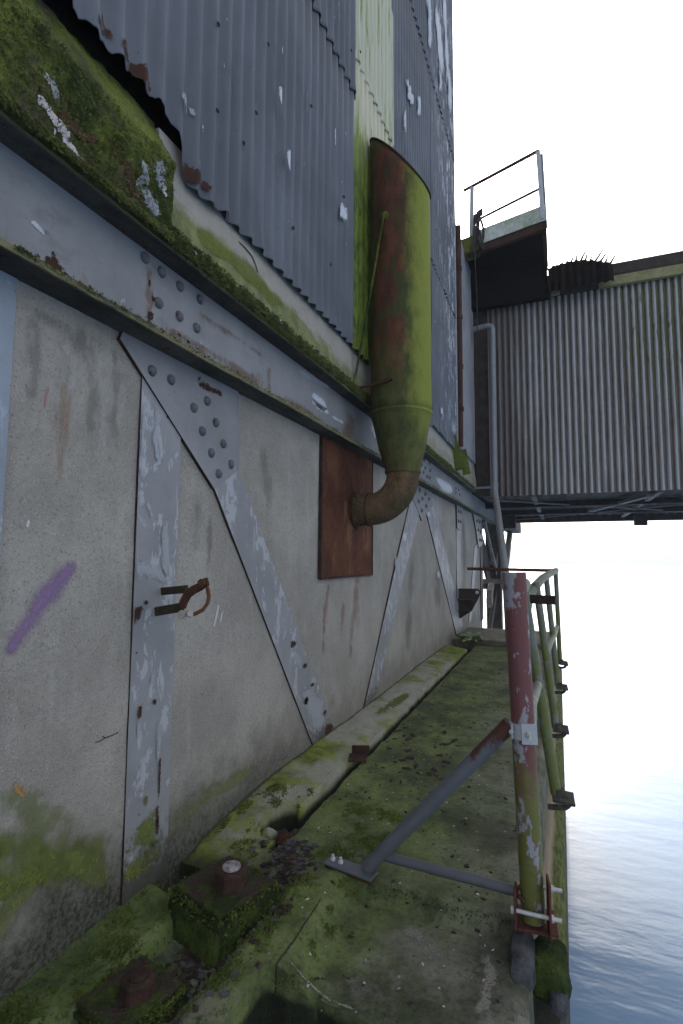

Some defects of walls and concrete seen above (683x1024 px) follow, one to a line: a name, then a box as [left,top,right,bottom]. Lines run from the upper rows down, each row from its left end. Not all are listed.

rust [101,13,151,92]
peeling [38,72,88,173]
peeling [135,160,167,216]
rust [184,157,212,191]
rust [198,377,222,396]
peeling [136,502,169,583]
peeling [301,688,325,729]